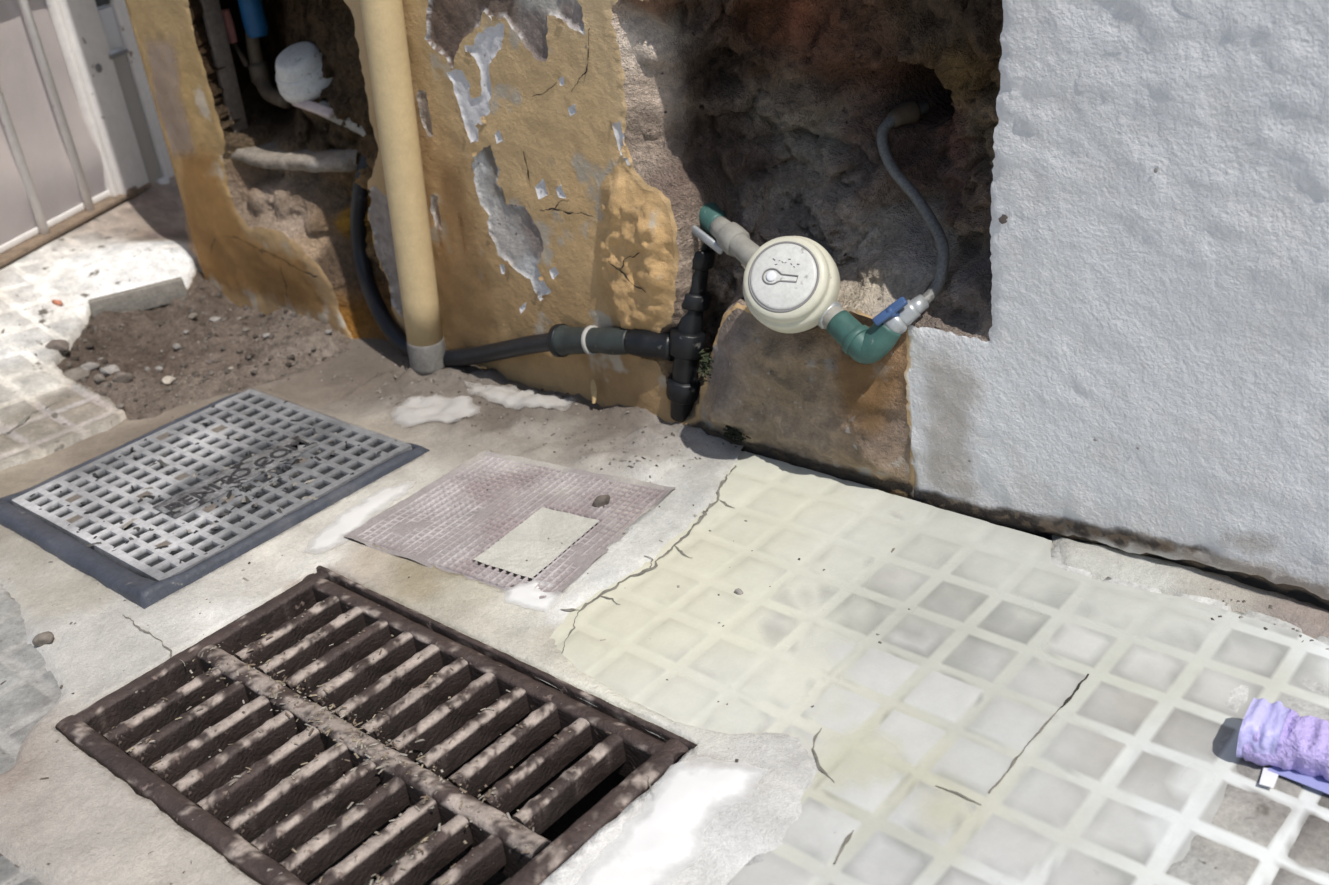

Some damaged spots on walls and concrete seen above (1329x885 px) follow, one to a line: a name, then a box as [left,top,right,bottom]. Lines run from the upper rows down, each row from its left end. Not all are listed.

peeling [417,90,434,137]
spalling [188,0,404,341]
peeling [425,0,585,314]
spalling [609,0,1008,485]
crack [560,465,736,652]
spalling [443,722,519,780]
spalling [475,738,552,800]
spalling [509,755,584,819]
spalling [540,771,626,843]
crack [936,674,1089,805]
spalling [307,810,404,885]
spalling [423,850,468,885]